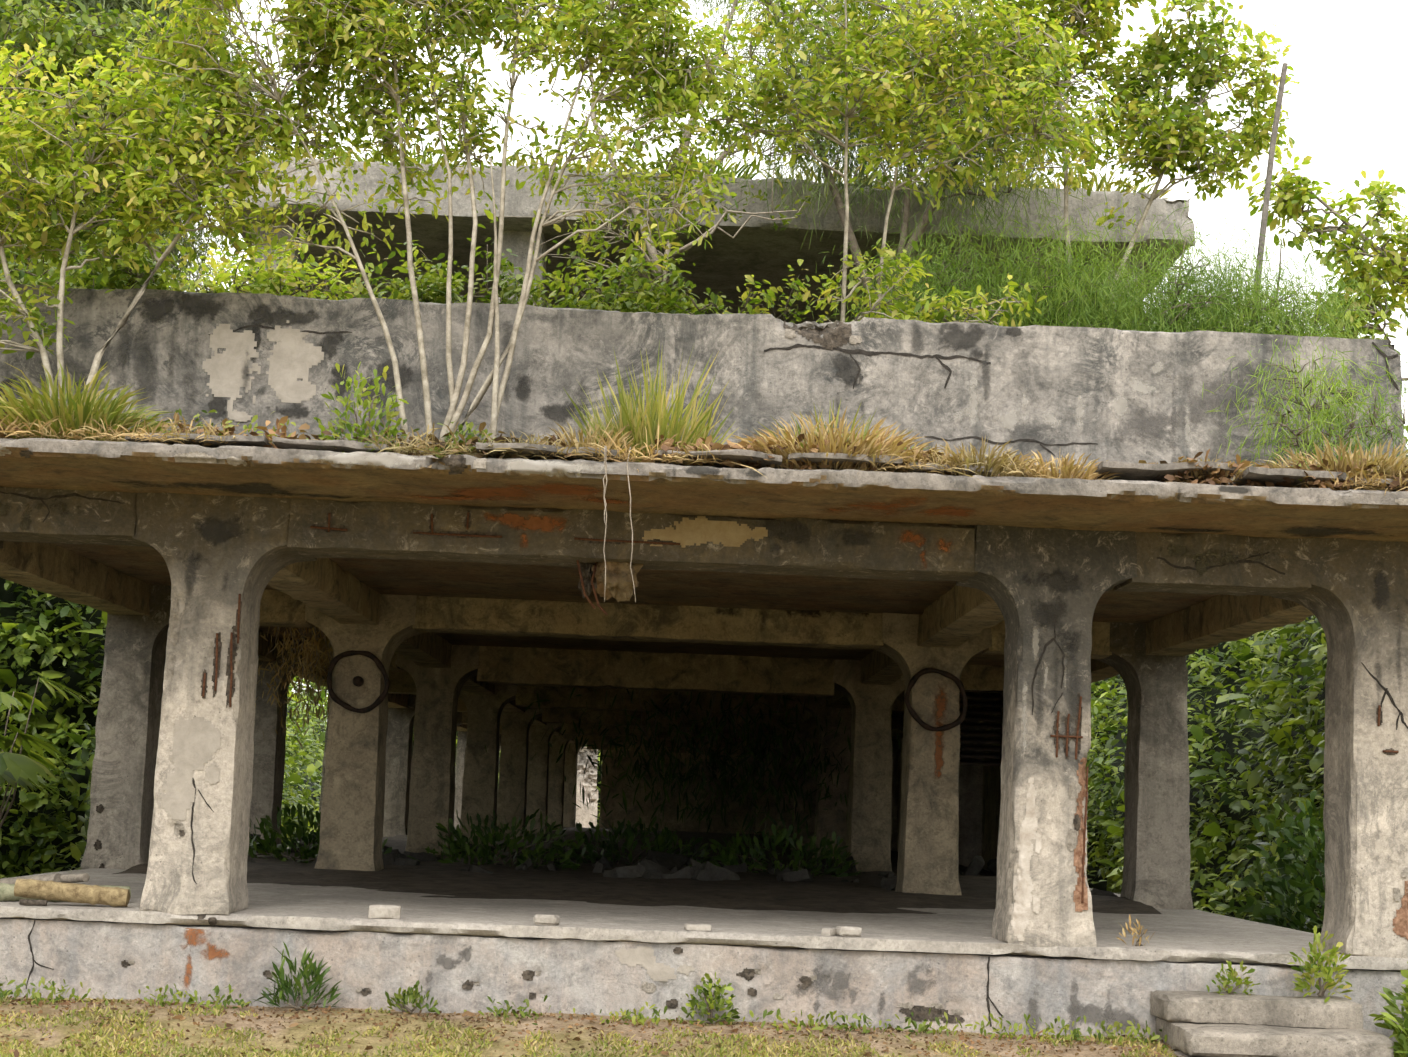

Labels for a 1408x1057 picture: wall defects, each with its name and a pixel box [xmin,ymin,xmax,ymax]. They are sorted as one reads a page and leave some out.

crack [764,344,991,389]
rust [412,483,628,546]
peeling [574,516,768,548]
spalling [166,599,185,681]
spalling [201,594,242,708]
crack [1361,662,1408,730]
rust [934,690,947,778]
spalling [174,823,185,838]
crack [190,778,214,884]
spalling [1393,867,1408,940]
crack [26,920,54,989]
rust [184,928,229,987]